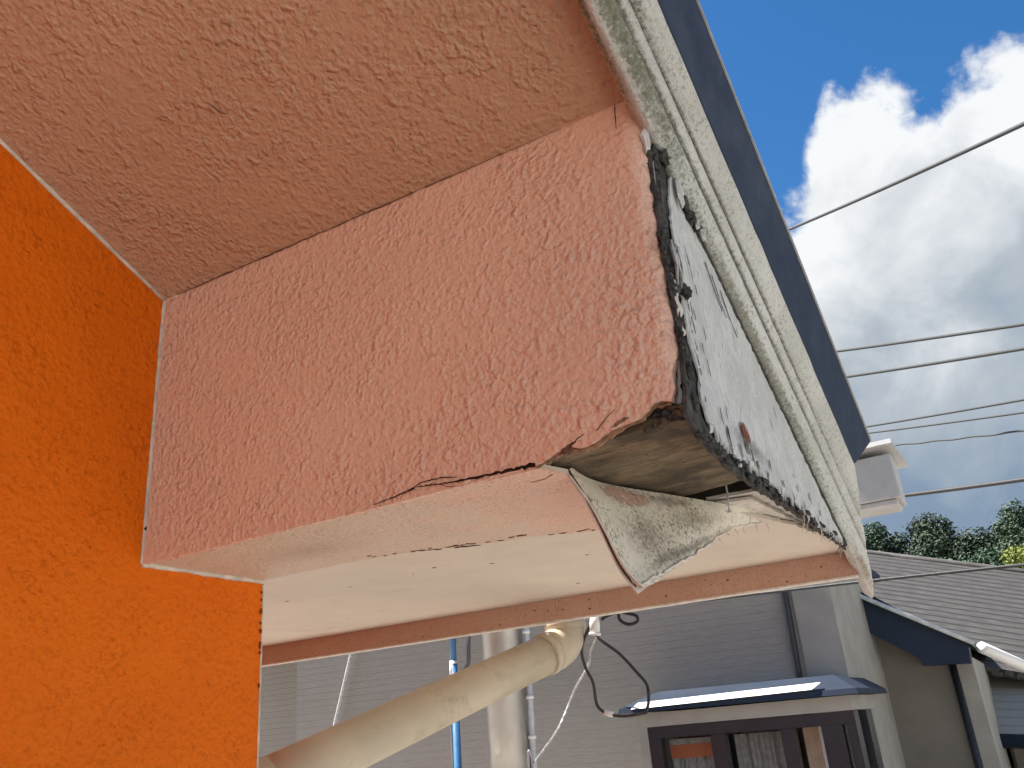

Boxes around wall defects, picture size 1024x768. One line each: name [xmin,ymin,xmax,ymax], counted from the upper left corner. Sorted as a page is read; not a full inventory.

spalling [639,128,656,183]
peeling [670,235,831,532]
crack [373,463,553,505]
spalling [411,534,527,552]